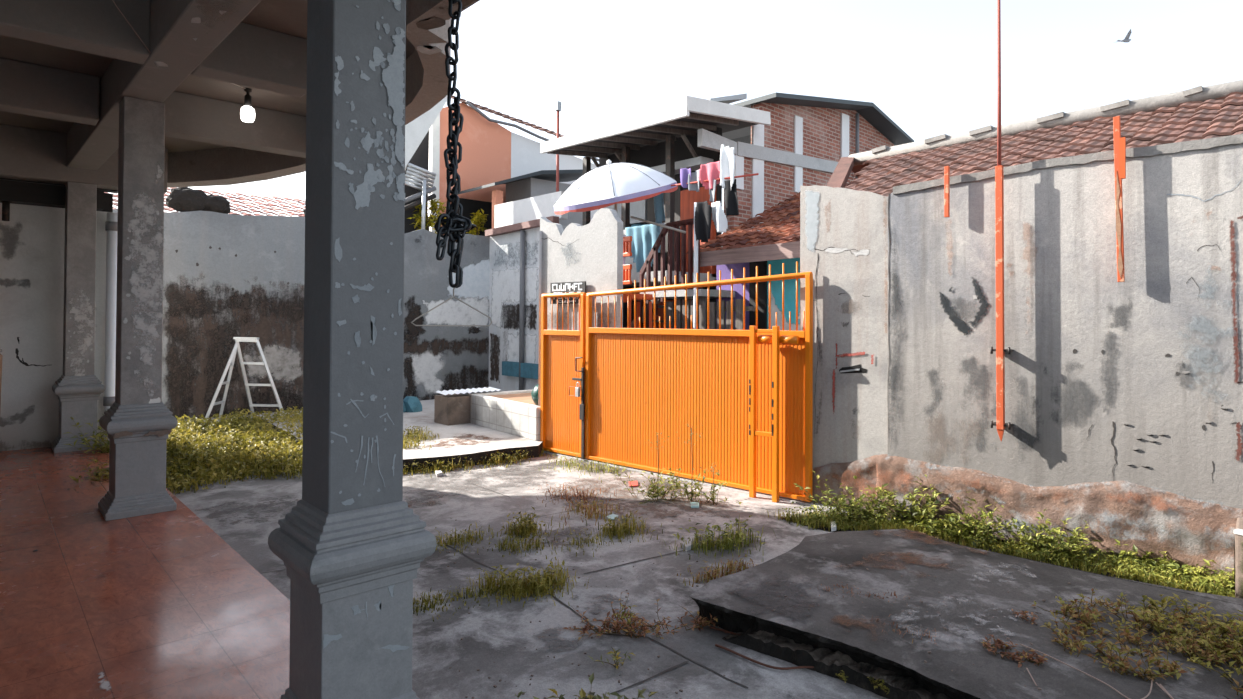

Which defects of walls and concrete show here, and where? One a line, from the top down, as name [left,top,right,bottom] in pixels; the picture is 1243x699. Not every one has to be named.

peeling [123,193,178,403]
leakage [163,283,304,420]
peeling [334,238,356,262]
peeling [335,272,402,376]
leakage [1054,306,1132,425]
rust [1230,216,1243,383]
peeling [330,392,396,505]